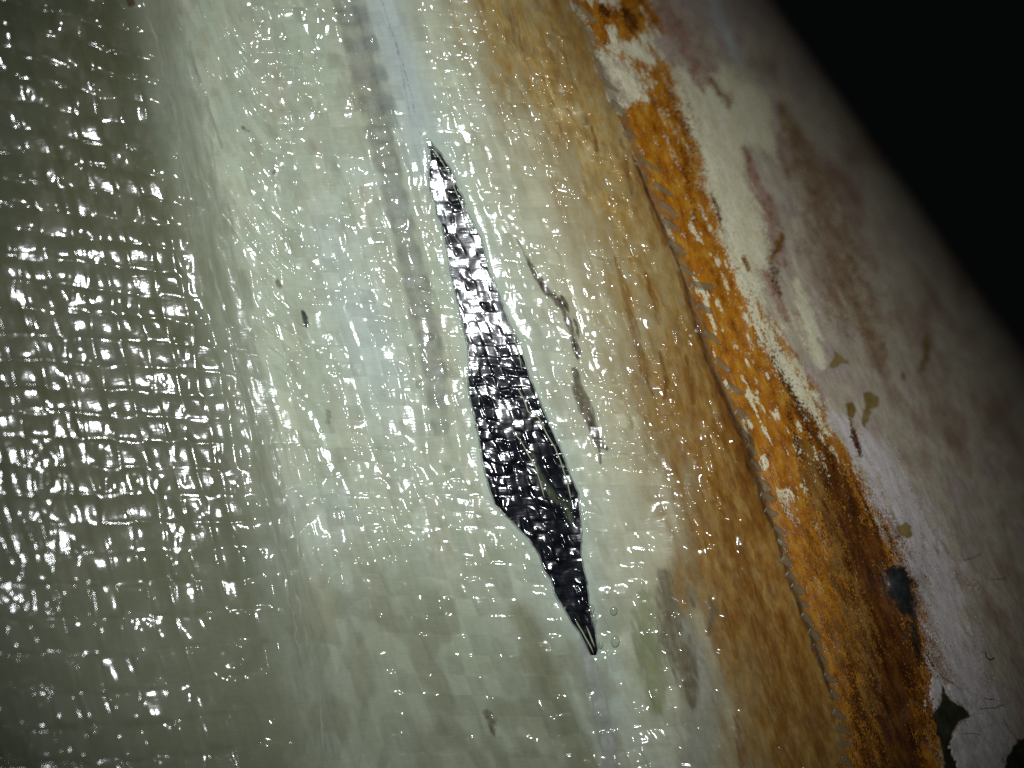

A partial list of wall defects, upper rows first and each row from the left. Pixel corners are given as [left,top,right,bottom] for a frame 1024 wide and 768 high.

crack [517,239,608,464]
corrosion [473,0,954,768]
peeling [924,677,1024,768]